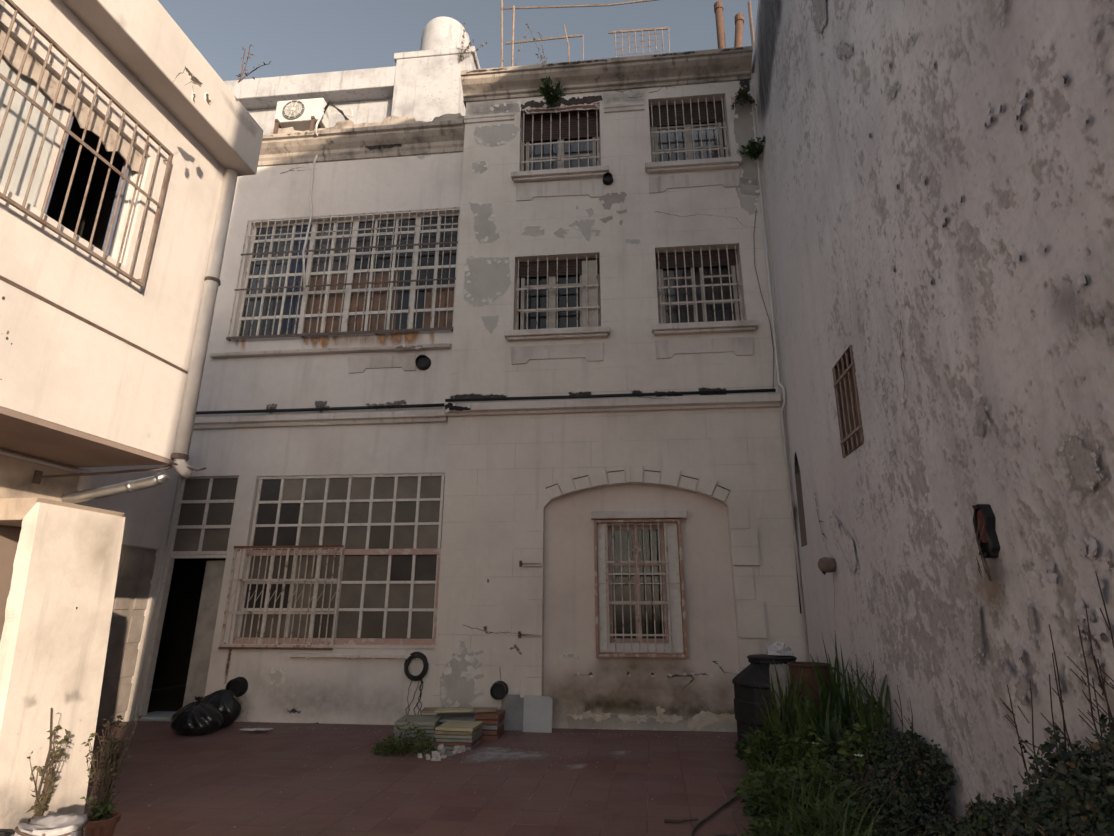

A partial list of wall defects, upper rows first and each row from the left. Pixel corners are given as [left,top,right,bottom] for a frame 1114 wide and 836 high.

peeling [472,95,603,174]
peeling [732,102,761,215]
flaking render [981,89,1028,134]
peeling [521,190,641,245]
peeling [460,201,512,334]
peeling [1059,431,1108,498]
flaking render [1073,537,1114,683]
peeling [439,640,484,707]
flaking render [566,706,737,732]